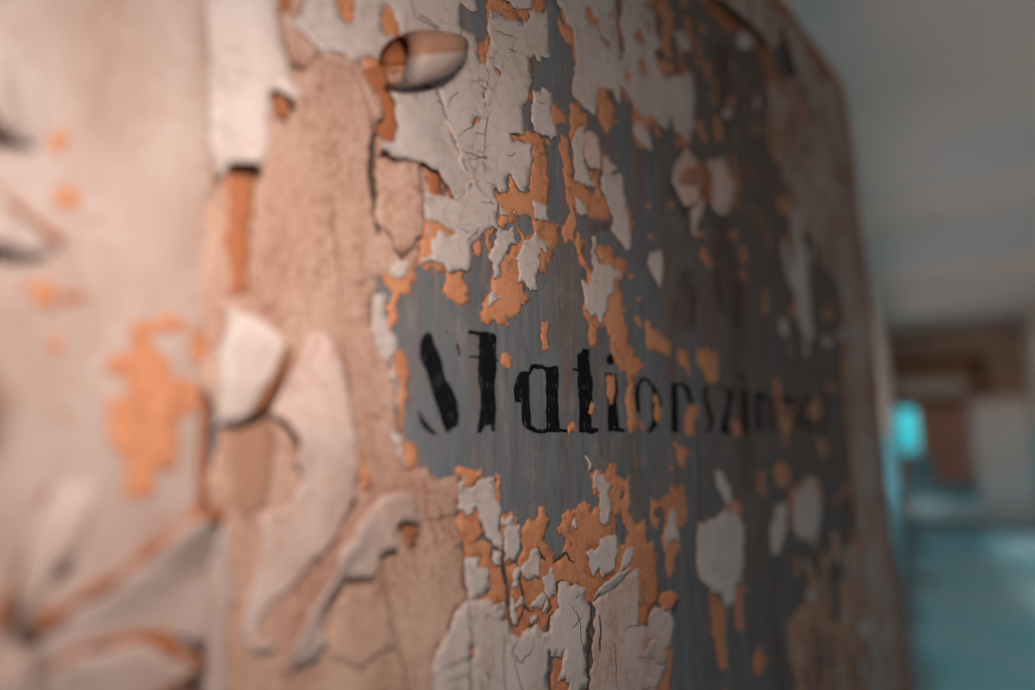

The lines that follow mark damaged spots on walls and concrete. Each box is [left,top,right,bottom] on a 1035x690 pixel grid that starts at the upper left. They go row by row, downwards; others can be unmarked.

crack [366,114,386,235]
crack [458,67,520,204]
peeling [105,0,909,690]
crack [386,539,667,690]